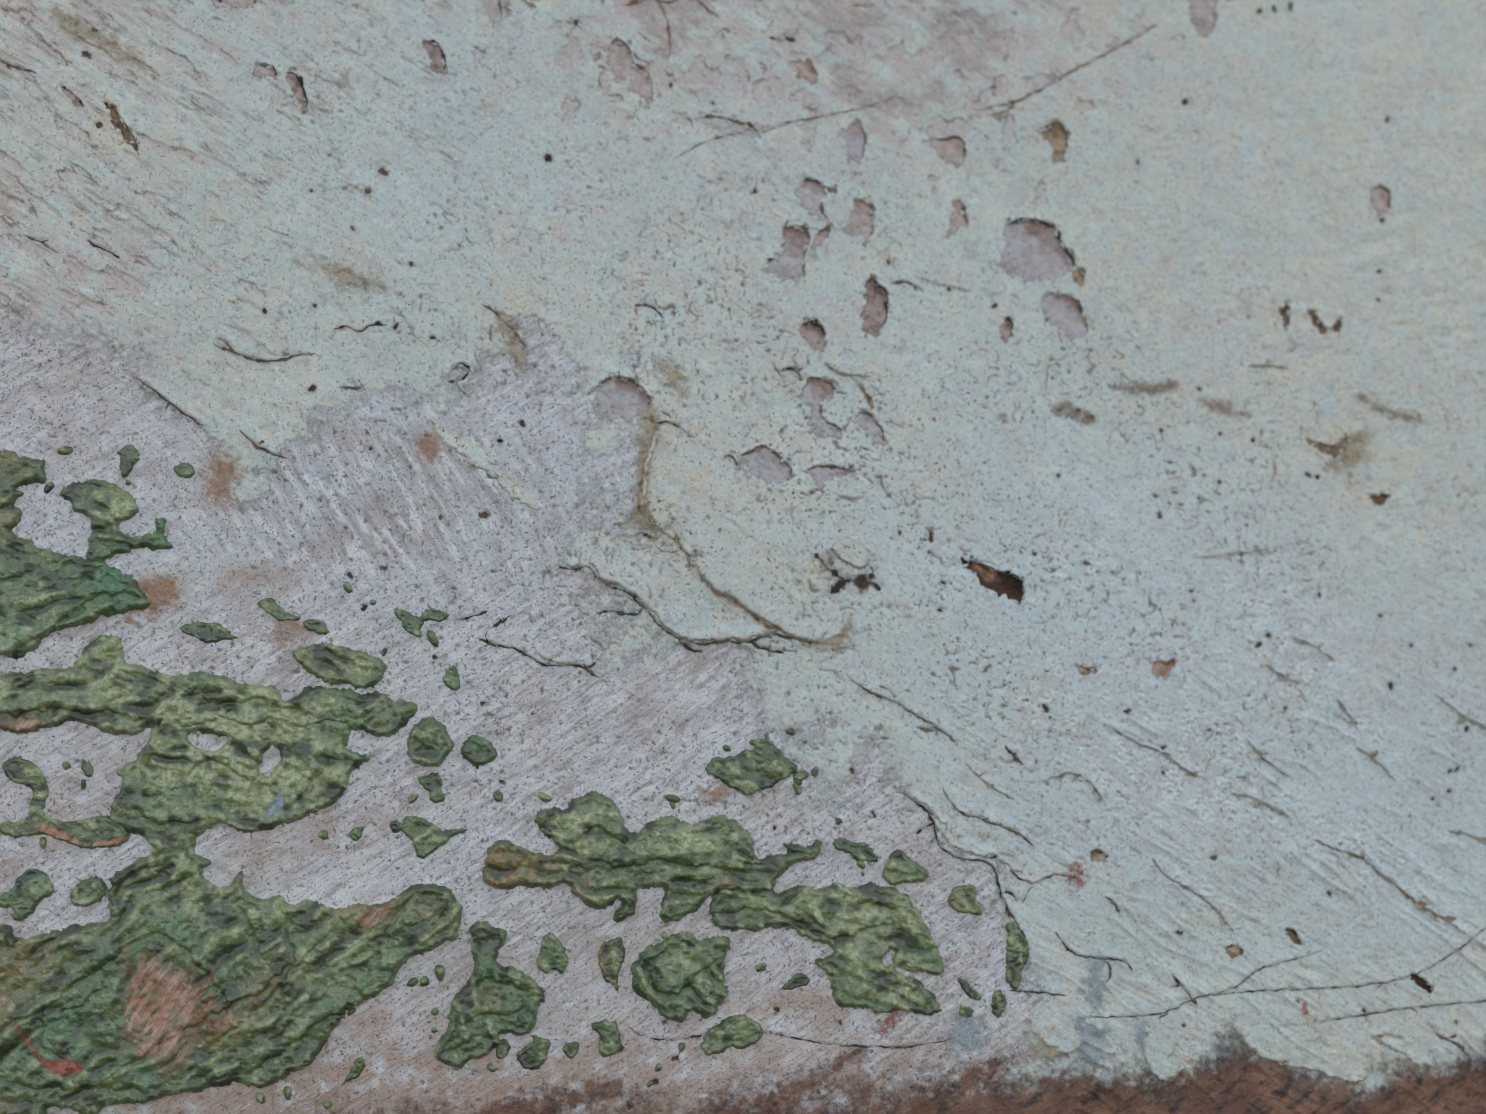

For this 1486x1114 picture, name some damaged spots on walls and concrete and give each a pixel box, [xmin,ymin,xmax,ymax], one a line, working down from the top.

crack [464,611,601,680]
peeling [0,302,1082,1114]
crack [781,360,874,409]
crack [557,399,1486,1059]